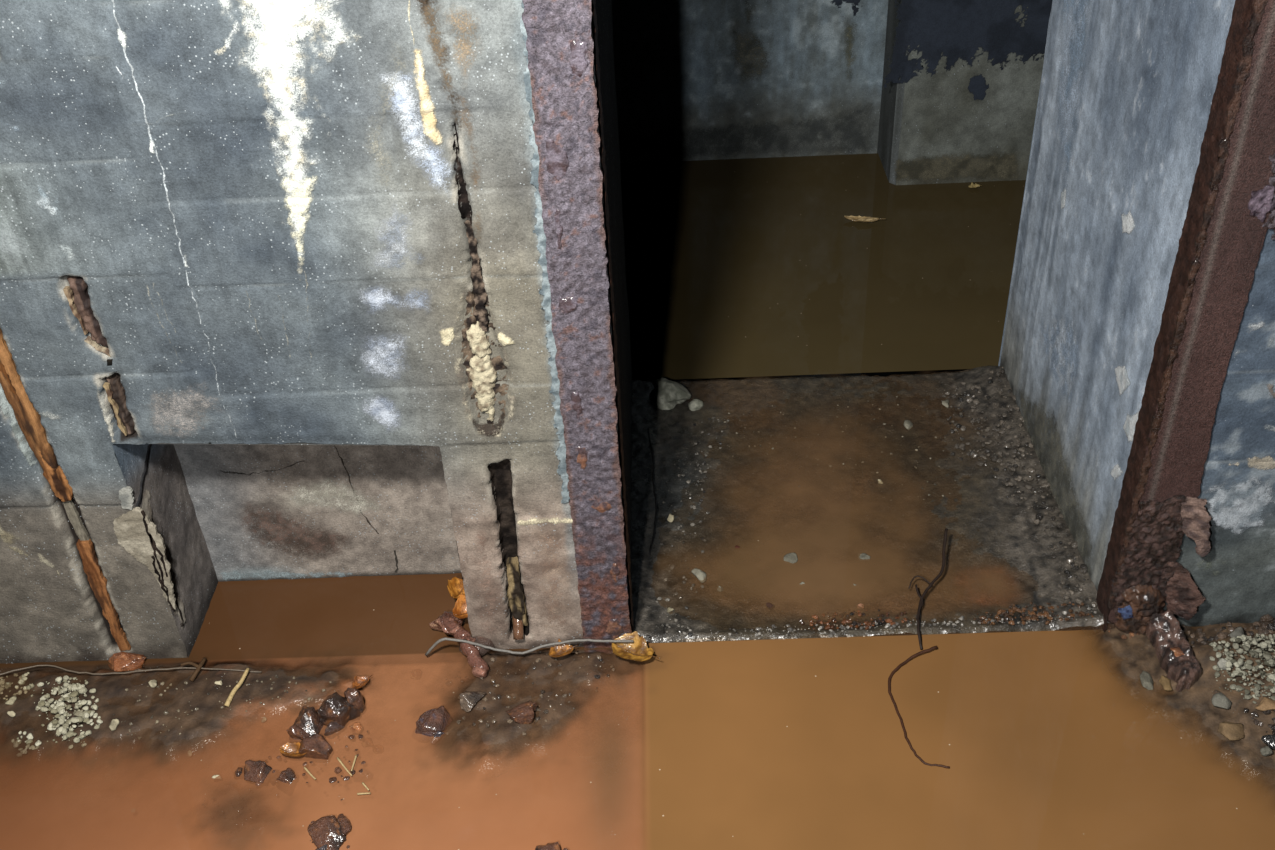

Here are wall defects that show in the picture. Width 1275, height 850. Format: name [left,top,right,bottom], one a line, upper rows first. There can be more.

corrosion [569,39,591,77]
peeling [968,74,989,100]
efflorescence [216,0,352,272]
corrosion [543,139,569,181]
crack [112,0,237,438]
crack [440,123,515,437]
corrosion [559,296,578,314]
corrosion [605,618,624,640]